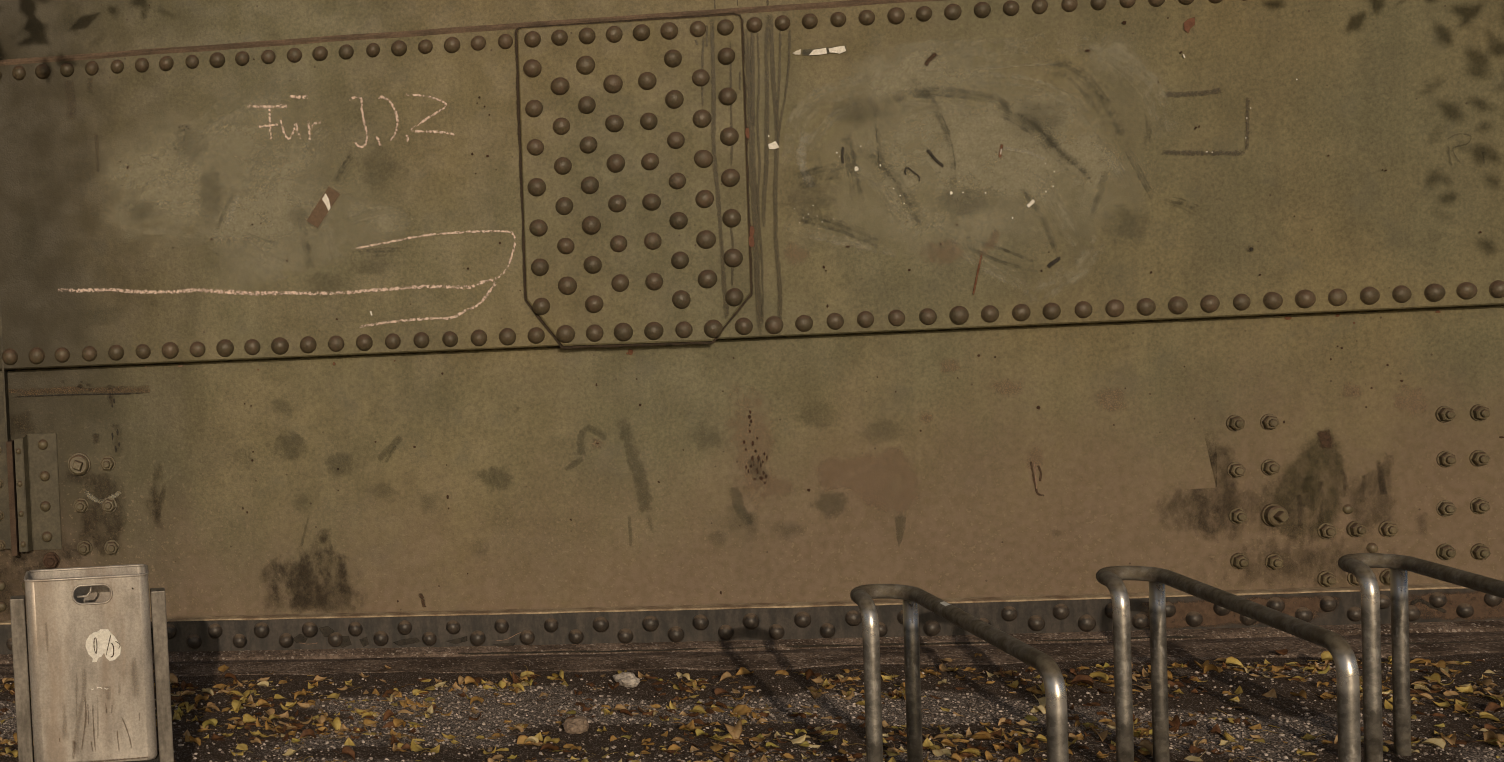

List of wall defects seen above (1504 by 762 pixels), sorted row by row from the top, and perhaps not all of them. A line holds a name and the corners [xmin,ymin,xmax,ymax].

leakage [695,23,791,326]
leakage [1275,430,1385,532]